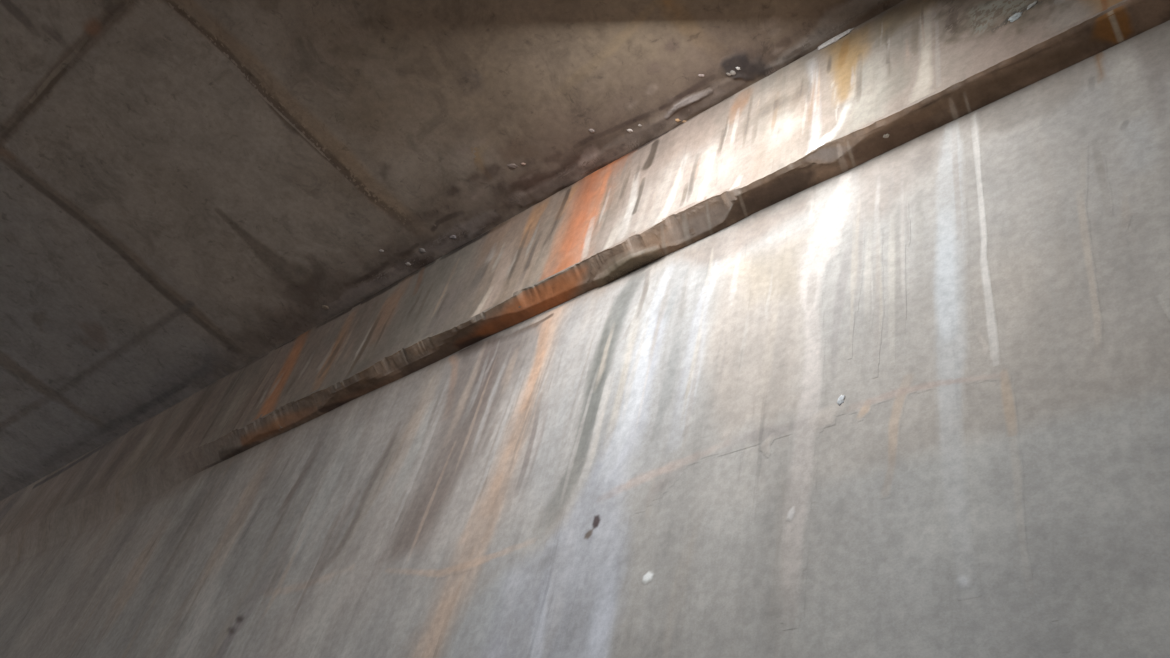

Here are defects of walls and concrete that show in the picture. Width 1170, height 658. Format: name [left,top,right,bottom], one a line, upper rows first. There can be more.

corrosion [1084,0,1138,46]
corrosion [238,329,318,444]
corrosion [398,147,640,658]
leakage [440,0,1170,658]